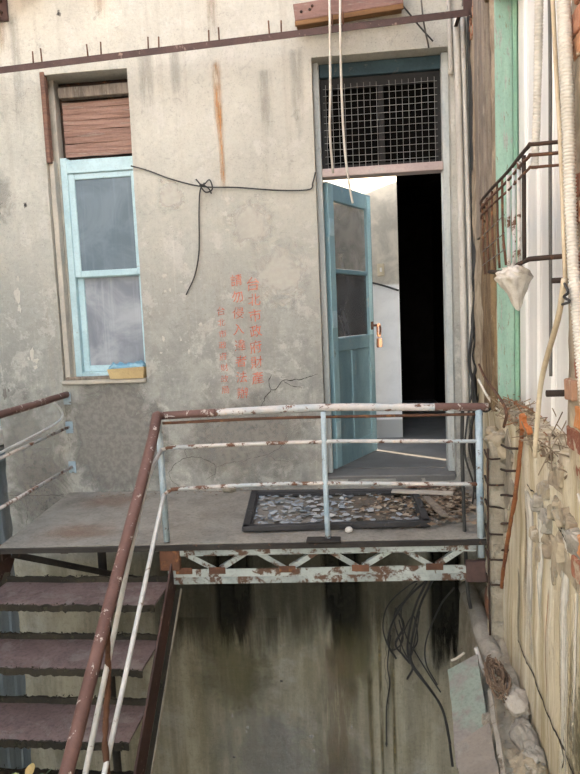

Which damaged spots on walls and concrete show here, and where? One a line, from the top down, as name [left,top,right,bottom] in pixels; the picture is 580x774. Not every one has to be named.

crack [261,374,311,406]
leakage [181,552,402,569]
leakage [429,552,460,565]
leakage [518,492,543,632]
leakage [160,581,403,774]
leakage [430,580,460,670]
leakage [559,572,578,752]